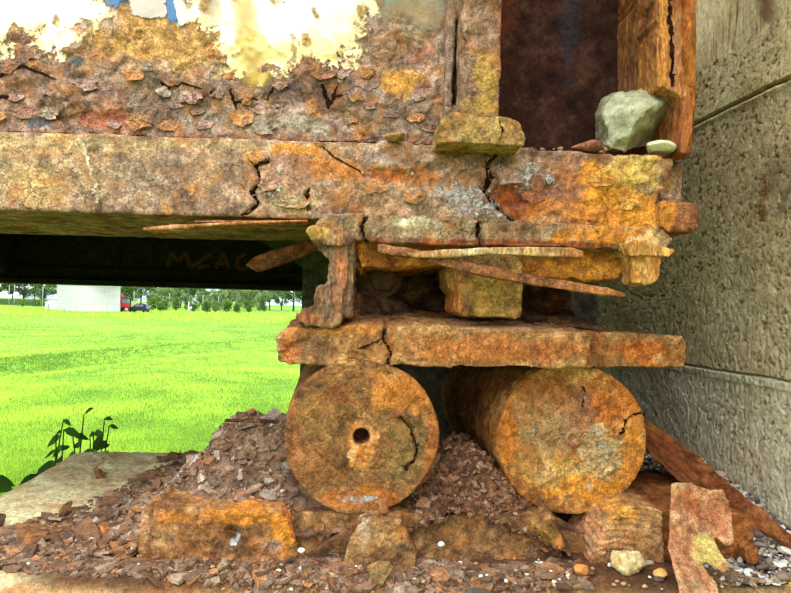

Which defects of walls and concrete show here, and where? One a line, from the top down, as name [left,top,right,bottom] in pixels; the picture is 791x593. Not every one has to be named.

peeling [0,0,445,135]
rust [233,0,266,82]
rust [290,33,311,51]
crack [241,159,269,216]
crack [478,119,514,221]
crack [474,222,482,243]